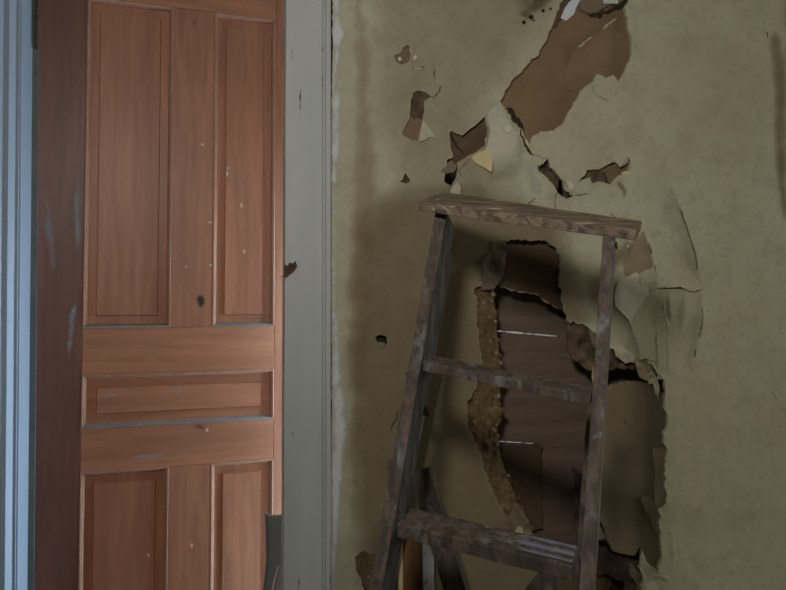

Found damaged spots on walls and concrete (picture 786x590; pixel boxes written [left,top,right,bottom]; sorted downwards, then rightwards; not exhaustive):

spalling [393,42,418,67]
spalling [400,88,436,144]
spalling [564,151,636,196]
spalling [474,239,563,370]
spalling [565,320,596,371]
spalling [595,230,673,590]
spalling [467,382,543,536]
spalling [572,465,582,543]
flaking render [355,551,375,590]